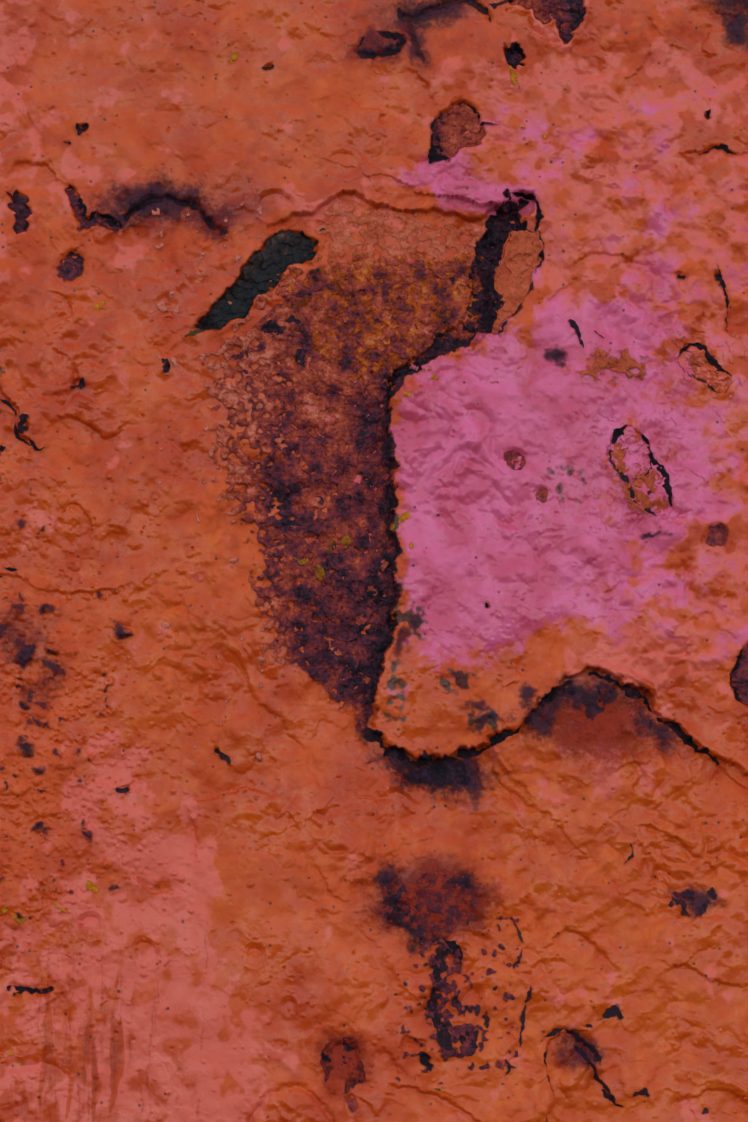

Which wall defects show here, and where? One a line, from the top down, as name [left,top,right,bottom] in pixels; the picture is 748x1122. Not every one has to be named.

crack [352,0,509,66]
crack [97,175,236,240]
spalling [255,186,301,231]
crack [1,399,45,451]
crack [364,671,719,789]
rust [361,859,532,1085]